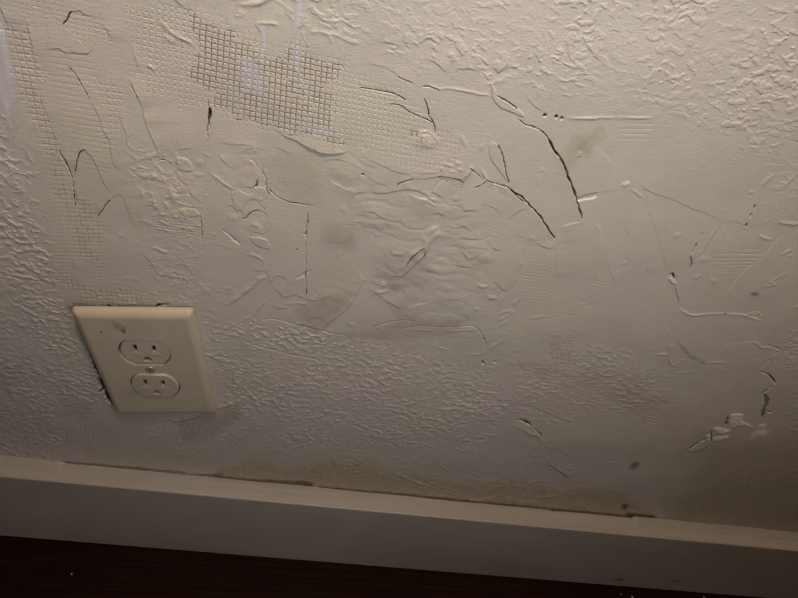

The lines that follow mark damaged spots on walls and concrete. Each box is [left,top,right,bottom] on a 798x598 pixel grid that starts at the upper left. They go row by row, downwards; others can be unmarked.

crack [360,52,654,222]
crack [262,169,311,234]
crack [488,180,557,248]
crack [761,347,778,417]
flaking render [689,413,770,452]